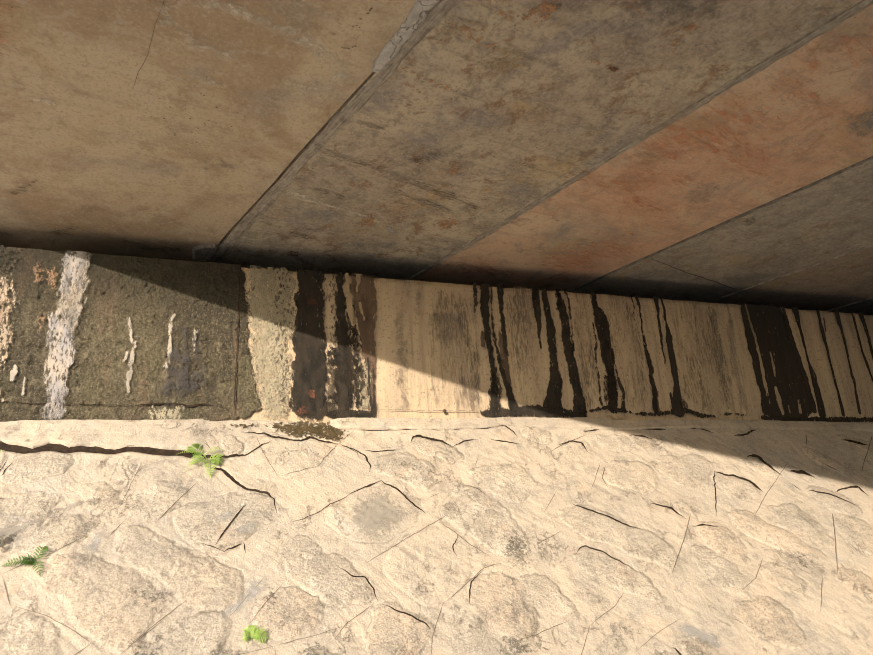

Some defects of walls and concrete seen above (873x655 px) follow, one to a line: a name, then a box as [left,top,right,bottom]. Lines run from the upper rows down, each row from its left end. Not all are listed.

peeling [372,0,440,73]
damp [0,245,22,370]
damp [43,251,92,417]
damp [122,317,137,393]
damp [245,265,377,421]
damp [432,282,873,422]
crack [0,409,518,655]
crack [552,429,640,529]
crack [575,545,633,569]
crack [652,430,872,605]